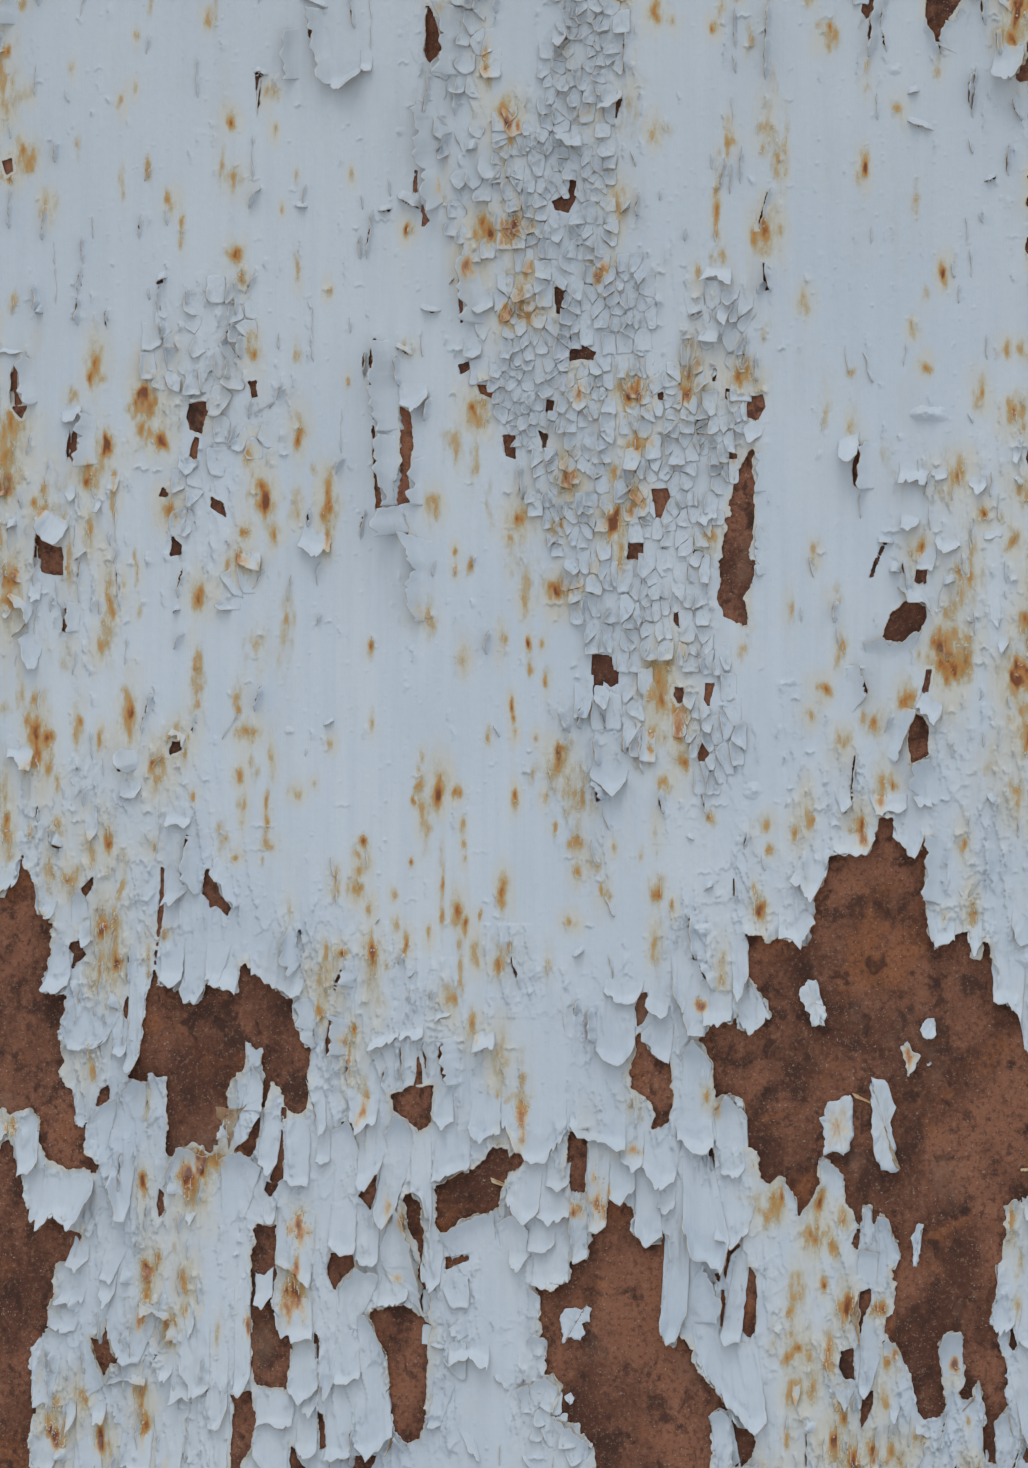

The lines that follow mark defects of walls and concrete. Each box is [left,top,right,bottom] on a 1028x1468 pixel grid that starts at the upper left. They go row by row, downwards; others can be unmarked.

crack [733,0,773,80]
peeling [397,0,774,831]
corrosion [704,449,756,625]
peeling [778,692,1028,1053]
corrosion [128,954,311,1205]
peeling [0,857,770,1468]
corrosion [629,992,674,1130]
peeling [819,1077,901,1196]
corrosion [699,815,1028,1468]
corrosion [230,1214,310,1468]
corrosion [535,1177,756,1468]
peeling [784,1204,1028,1468]